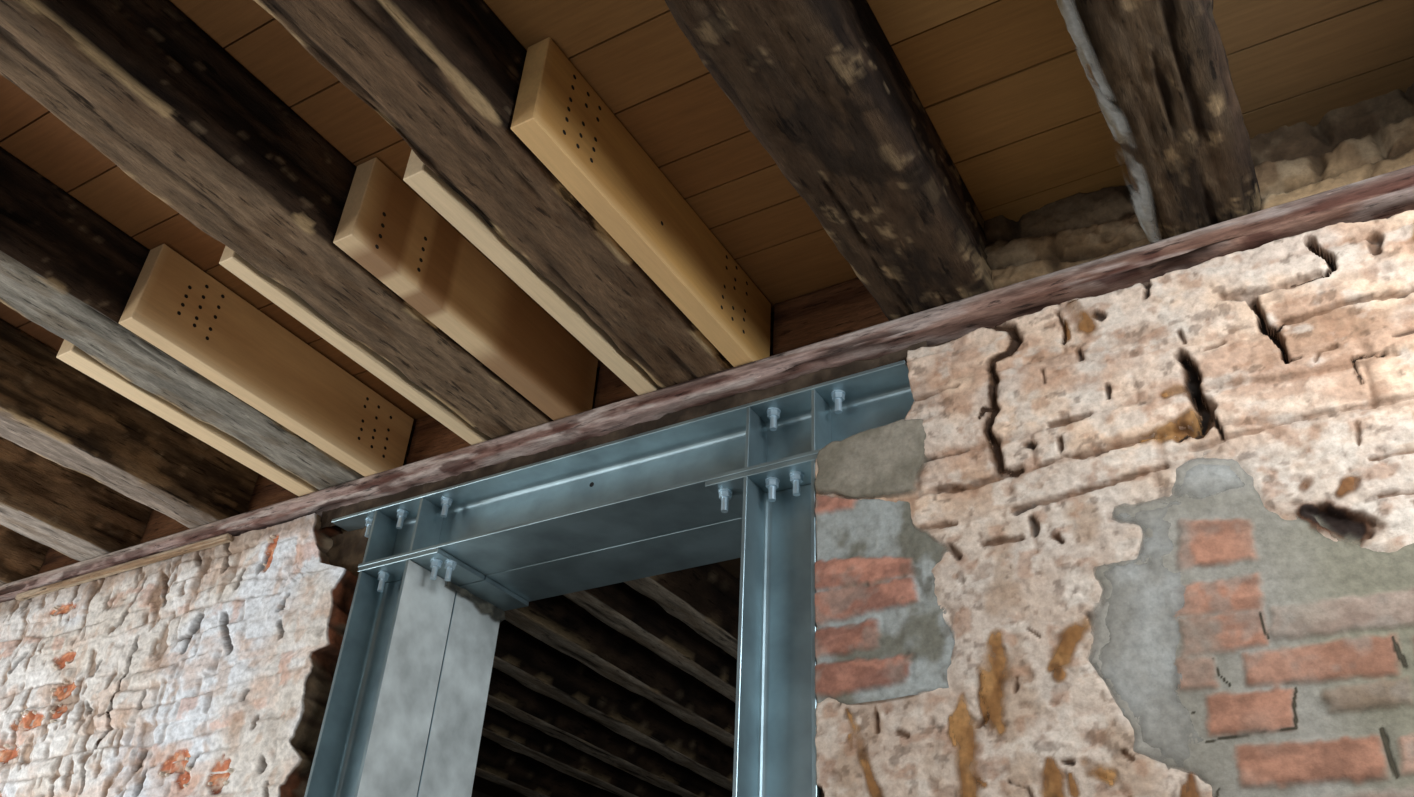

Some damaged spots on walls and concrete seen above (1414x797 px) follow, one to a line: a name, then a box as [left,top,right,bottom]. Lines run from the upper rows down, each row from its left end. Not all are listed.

crack [1291,245,1336,287]
crack [1253,305,1299,364]
crack [978,326,1024,477]
crack [1179,357,1224,442]
spalling [1089,457,1414,797]